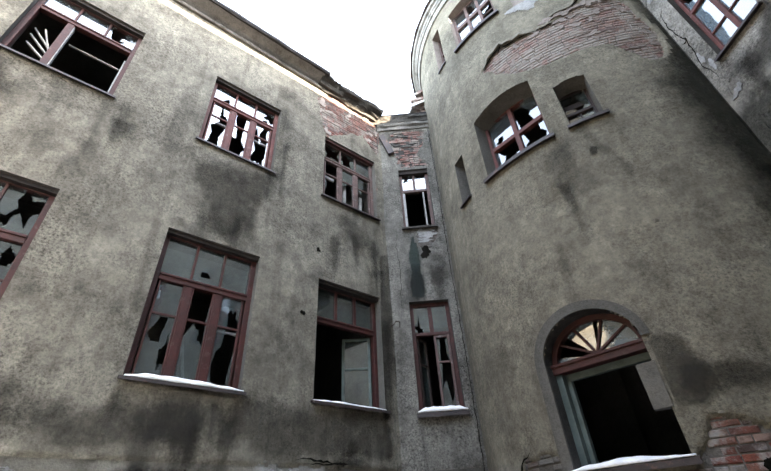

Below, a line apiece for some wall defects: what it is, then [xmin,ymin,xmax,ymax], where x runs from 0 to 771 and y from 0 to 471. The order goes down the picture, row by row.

flaking render [483,0,664,75]
flaking render [696,53,718,70]
flaking render [317,96,379,155]
flaking render [389,131,428,168]
leakage [638,0,771,216]
leakage [198,162,267,235]
leakage [409,237,425,297]
flaking render [416,229,437,258]
flaking render [686,416,771,471]